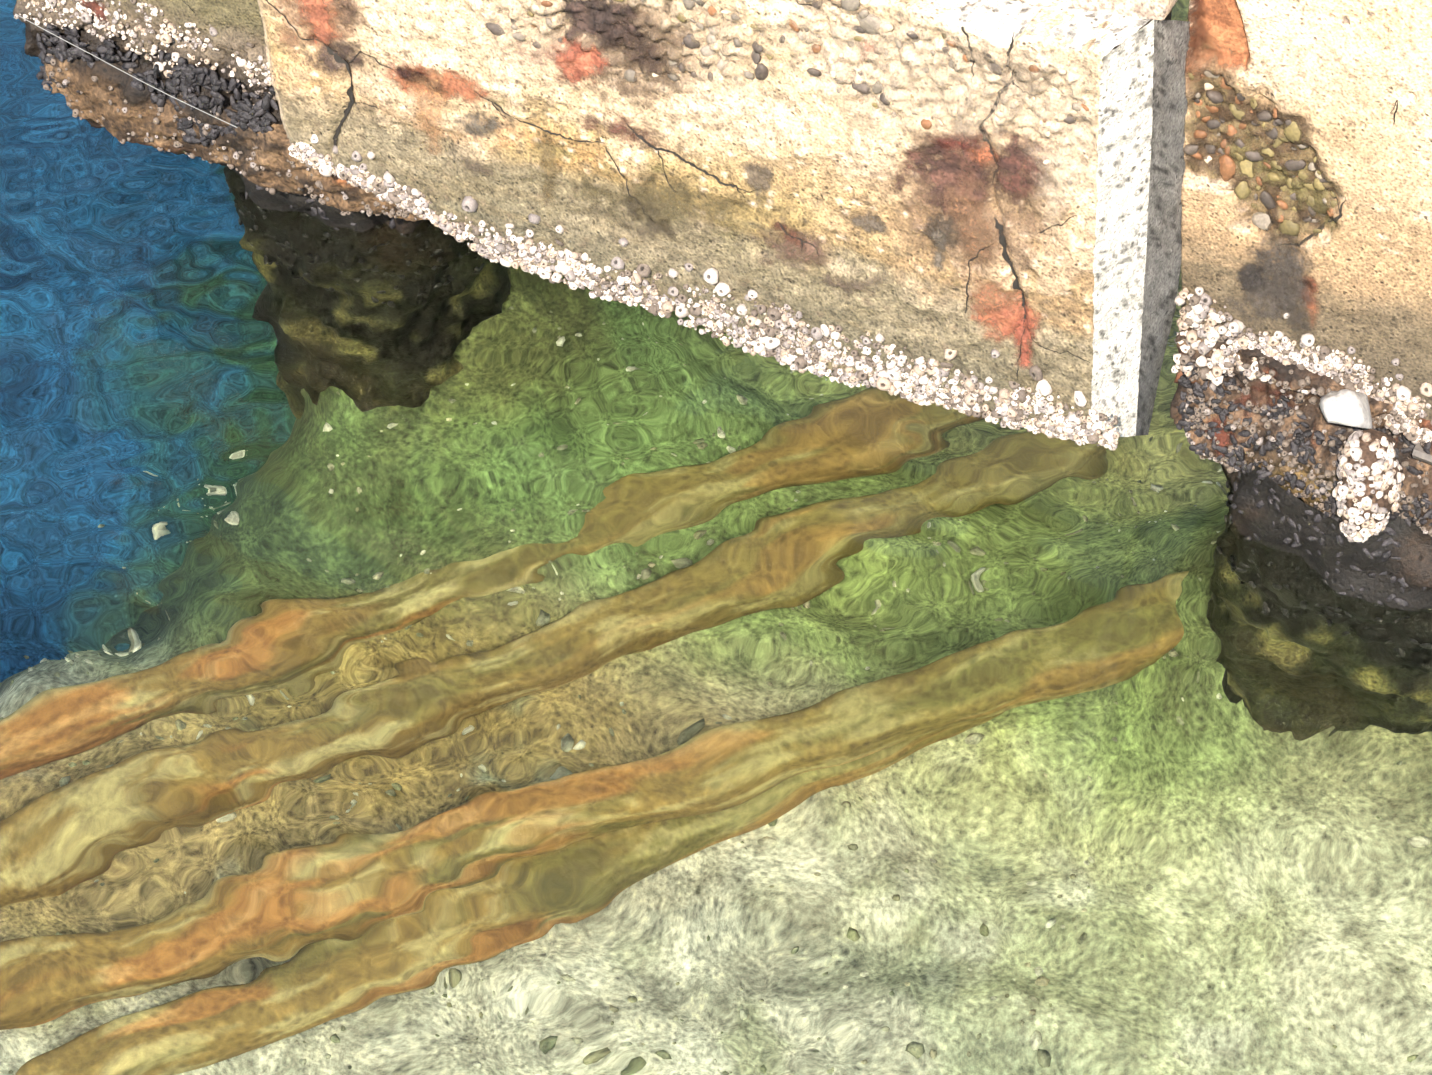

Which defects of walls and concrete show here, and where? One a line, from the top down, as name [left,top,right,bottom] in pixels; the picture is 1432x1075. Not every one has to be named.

rust [281,0,363,75]
crack [266,0,395,155]
rust [520,0,688,99]
rust [1185,0,1250,88]
crack [477,93,758,223]
crack [778,221,819,256]
rust [896,128,1048,266]
crack [961,26,1090,380]
spalling [1183,69,1342,236]
rust [972,283,1039,367]